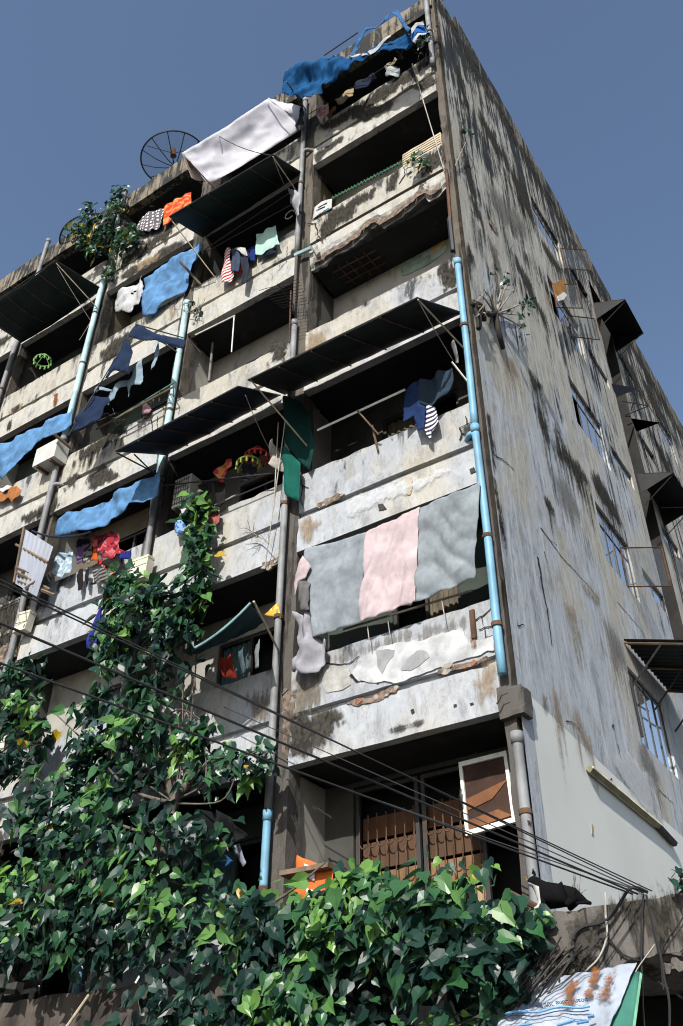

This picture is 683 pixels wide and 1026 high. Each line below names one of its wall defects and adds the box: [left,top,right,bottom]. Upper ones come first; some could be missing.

damp [437,0,608,344]
damp [621,343,683,472]
damp [21,399,154,523]
damp [487,413,507,548]
damp [505,352,628,552]
damp [329,617,466,663]
peeling [322,628,495,707]
damp [285,675,344,757]
damp [390,720,423,732]
damp [543,690,594,766]
damp [640,744,662,814]
spalling [663,957,683,975]